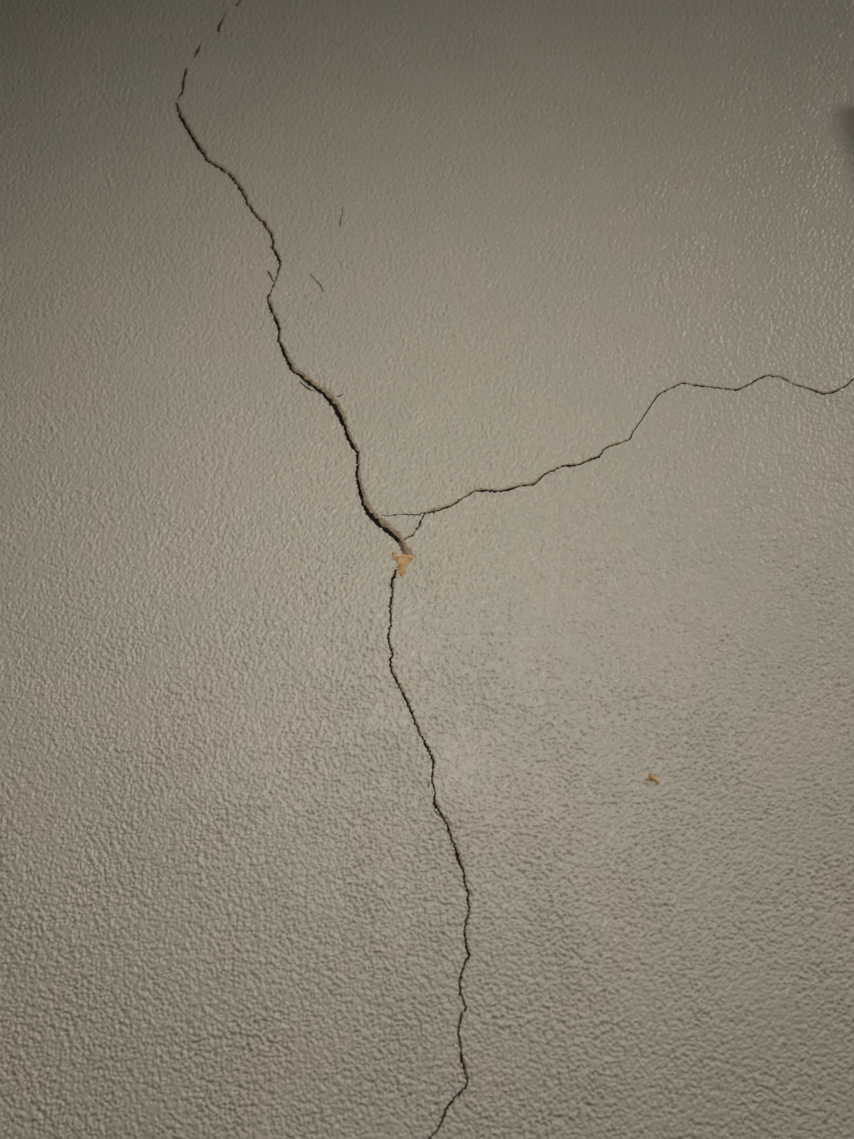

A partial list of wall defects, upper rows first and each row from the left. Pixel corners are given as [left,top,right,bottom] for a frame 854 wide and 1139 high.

crack [175,0,854,1139]